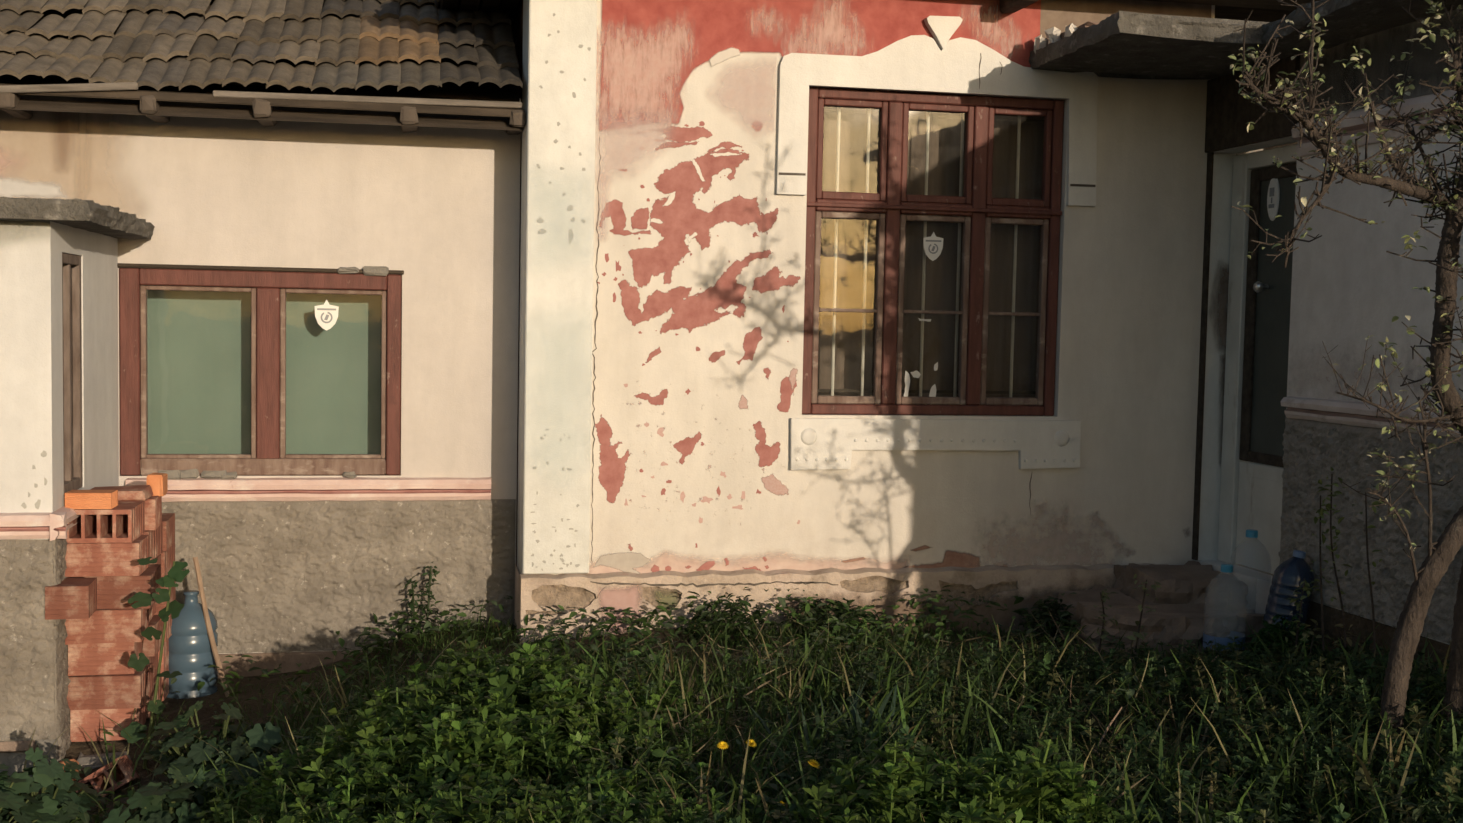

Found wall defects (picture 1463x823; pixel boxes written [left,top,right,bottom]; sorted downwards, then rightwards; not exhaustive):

peeling [536,0,1212,412]
peeling [595,395,789,523]
spalling [526,491,682,637]
spalling [840,545,1017,605]
leakage [783,582,1114,639]